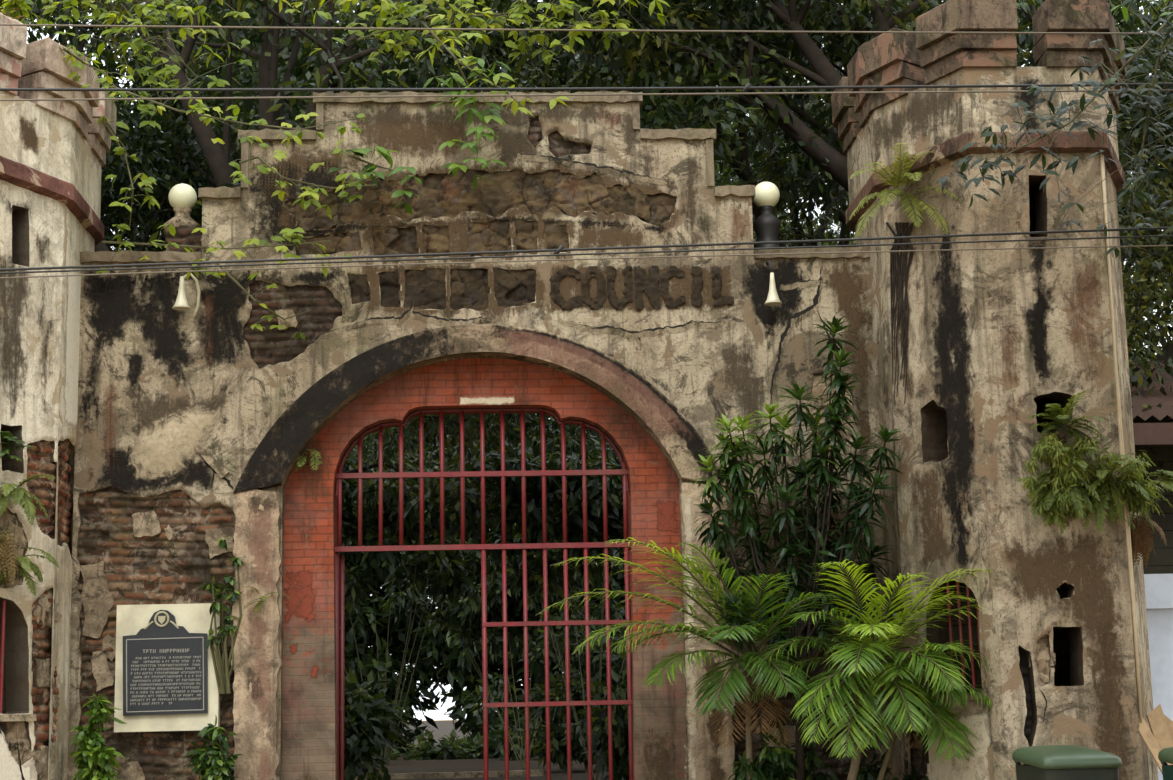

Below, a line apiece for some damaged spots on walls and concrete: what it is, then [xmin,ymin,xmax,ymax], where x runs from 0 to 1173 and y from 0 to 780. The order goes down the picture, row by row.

leakage [0,256,53,416]
peeling [64,269,81,427]
leakage [80,268,337,495]
leakage [233,327,453,512]
flaking render [243,116,677,369]
leakage [250,104,803,478]
leakage [912,226,975,571]
leakage [1026,238,1053,380]
flaking render [0,509,28,588]
flaking render [0,587,62,780]
flaking render [26,439,237,780]
leakage [247,667,263,699]